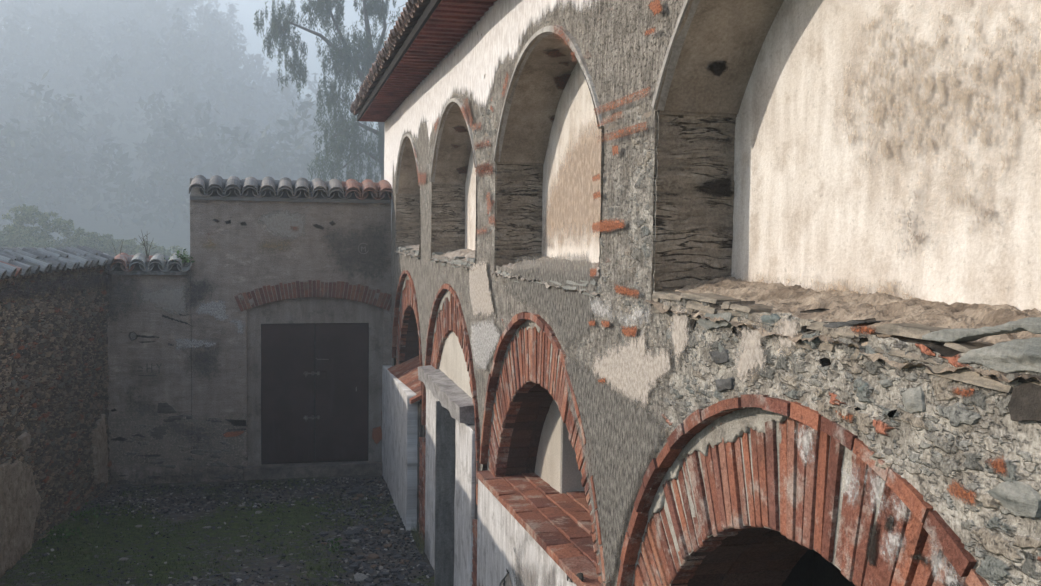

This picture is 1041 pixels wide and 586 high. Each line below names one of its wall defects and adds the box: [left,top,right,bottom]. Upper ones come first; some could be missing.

flaking render [545,27,575,90]
flaking render [707,61,728,76]
leakage [844,13,1041,171]
spalling [823,320,884,341]
spalling [922,317,1041,421]
peeling [0,432,41,578]
spalling [947,457,1041,518]